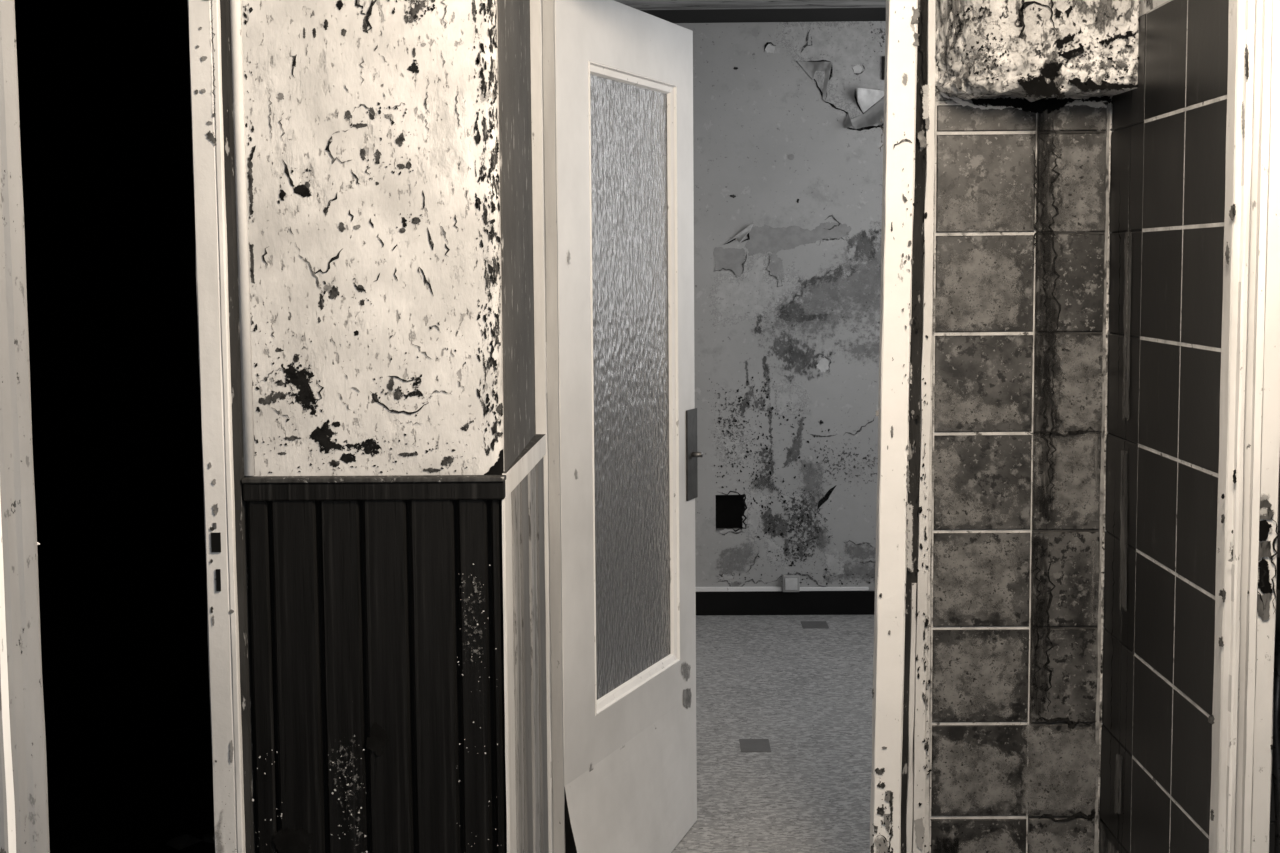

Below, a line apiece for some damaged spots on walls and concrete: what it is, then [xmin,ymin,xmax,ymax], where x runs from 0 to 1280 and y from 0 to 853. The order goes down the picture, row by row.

peeling [245,122,256,223]
peeling [252,0,504,475]
flaking render [880,1,1139,338]
crack [1018,0,1062,39]
water stain [708,230,882,587]
peeling [903,364,932,789]
crack [1027,109,1128,853]
peeling [871,768,894,853]
peeling [914,802,932,853]